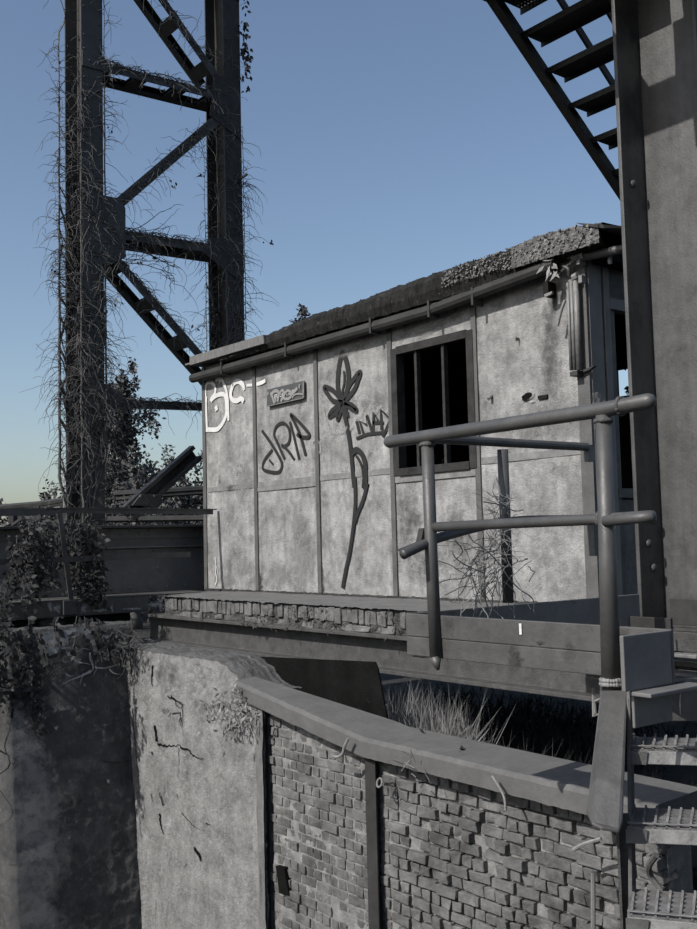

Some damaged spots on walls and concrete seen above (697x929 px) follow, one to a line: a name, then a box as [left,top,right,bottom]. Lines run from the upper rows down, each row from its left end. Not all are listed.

damp [8,699,65,929]